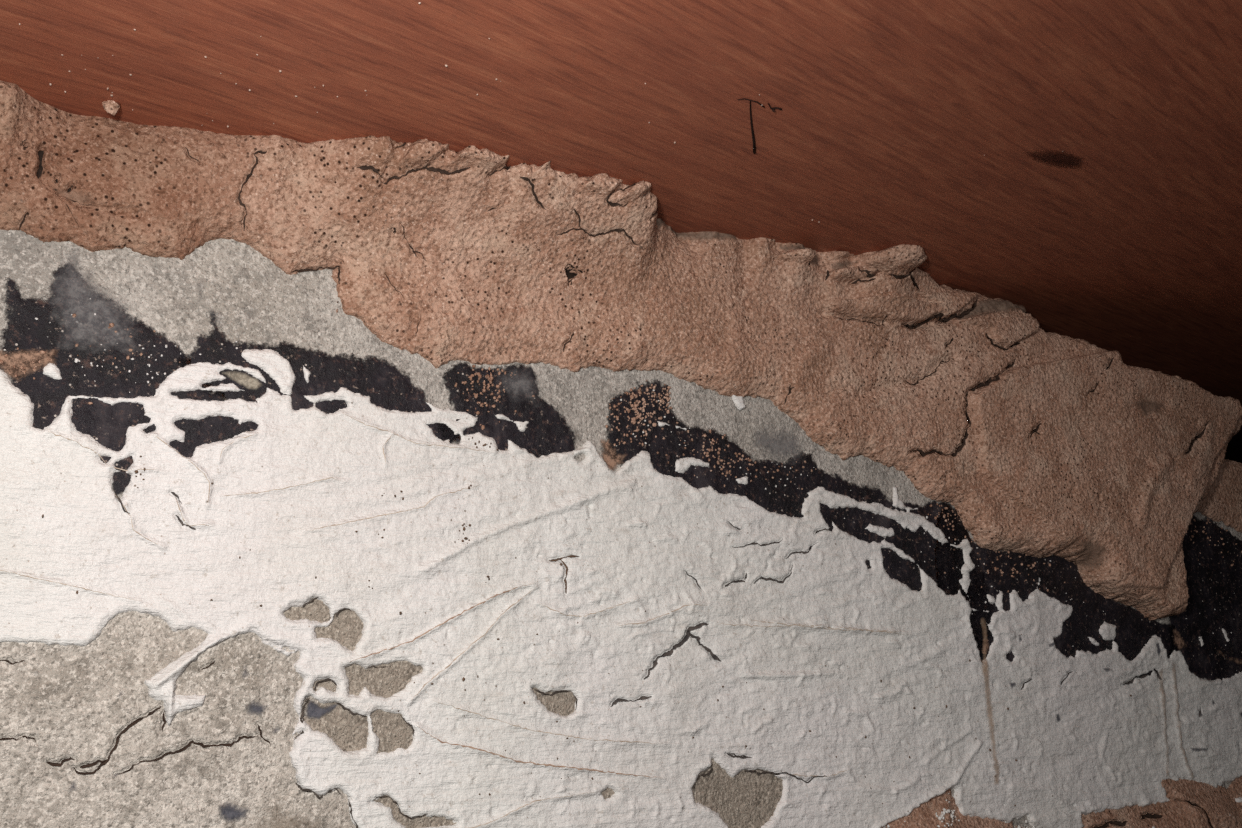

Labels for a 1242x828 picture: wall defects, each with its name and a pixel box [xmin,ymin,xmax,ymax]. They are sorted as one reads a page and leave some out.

crack [238,151,267,229]
crack [356,142,658,250]
peeling [732,395,745,410]
crack [1185,421,1209,454]
crack [686,521,830,589]
crack [611,622,721,707]
crack [0,706,271,775]
peeling [0,597,423,828]
peeling [692,758,783,828]